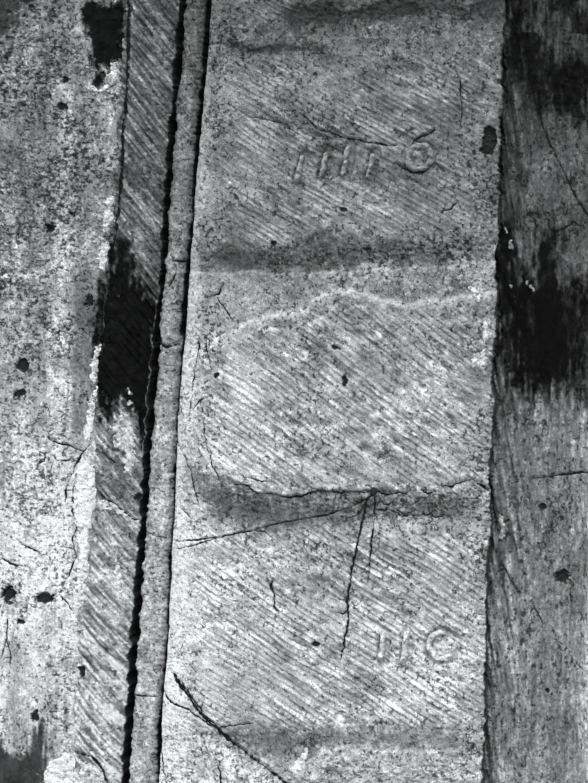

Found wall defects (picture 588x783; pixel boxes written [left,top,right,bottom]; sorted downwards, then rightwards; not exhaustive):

damp [81,0,125,88]
damp [91,237,156,450]
damp [496,221,588,405]
crack [99,337,491,658]
crack [537,471,586,479]
damp [0,720,54,783]
crack [135,671,287,783]